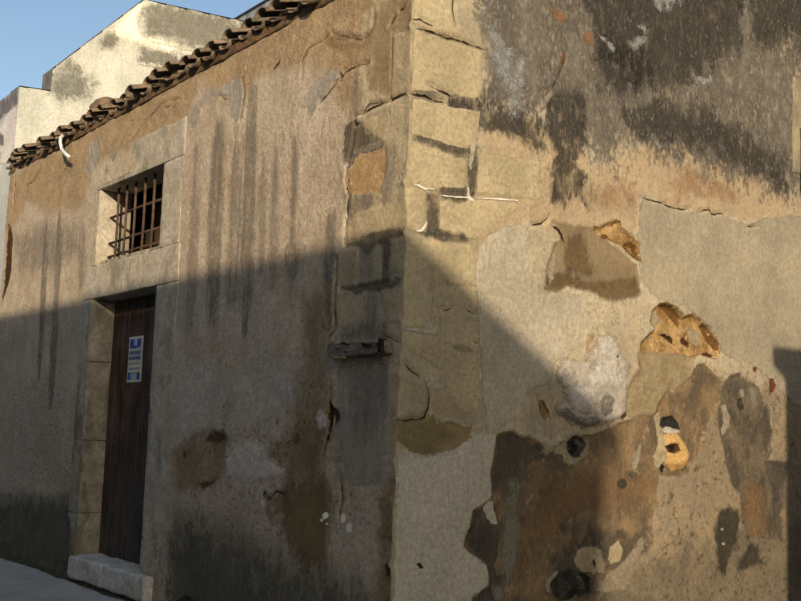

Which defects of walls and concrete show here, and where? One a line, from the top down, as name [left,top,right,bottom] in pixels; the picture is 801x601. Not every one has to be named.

crack [301,0,485,73]
leakage [448,0,801,209]
leakage [38,216,61,407]
leakage [207,120,223,322]
leakage [240,90,256,336]
peeling [532,216,643,300]
spalling [172,432,228,492]
crack [324,387,334,453]
flaking render [327,402,340,442]
spalling [464,302,789,601]
leakage [0,492,73,574]
leakage [165,476,343,601]